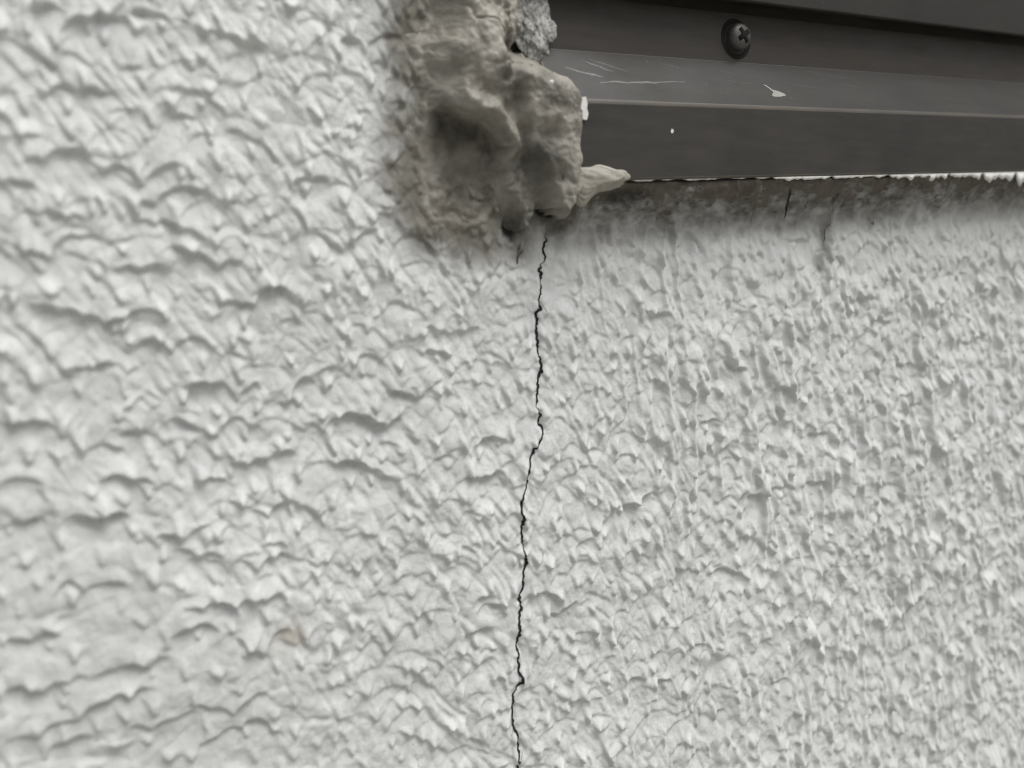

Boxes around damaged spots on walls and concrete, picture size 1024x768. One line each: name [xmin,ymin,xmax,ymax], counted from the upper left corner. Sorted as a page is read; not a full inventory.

crack [511,234,548,768]